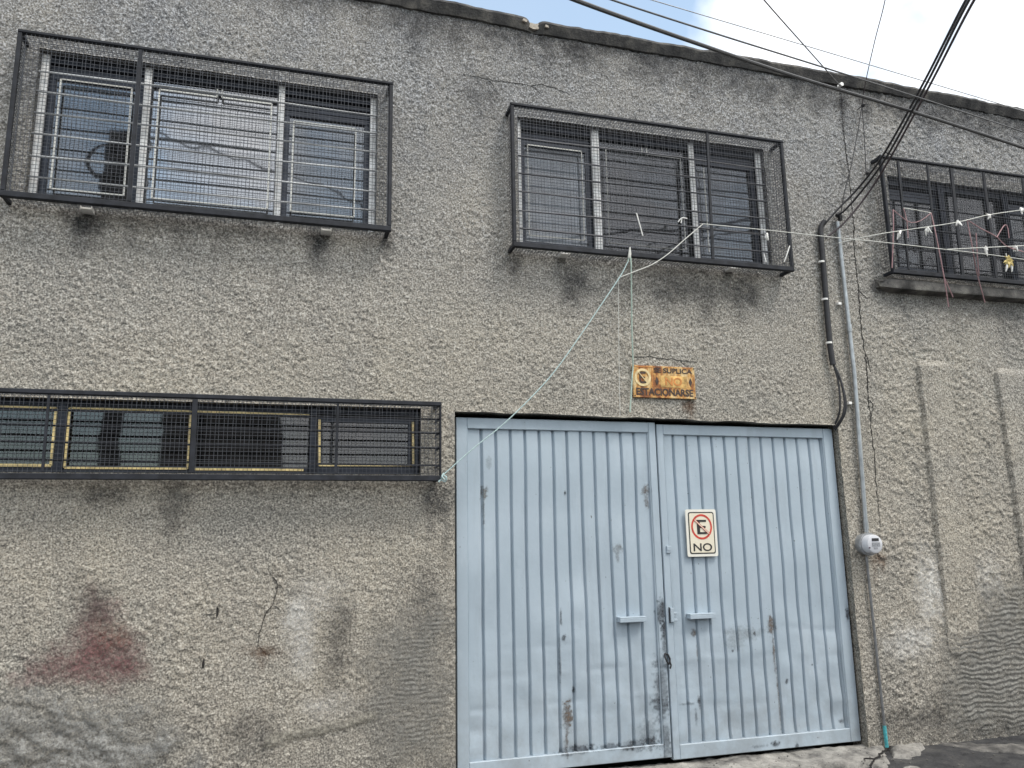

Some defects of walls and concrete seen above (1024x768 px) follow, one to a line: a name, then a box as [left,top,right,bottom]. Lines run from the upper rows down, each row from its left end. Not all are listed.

crack [463,74,570,95]
crack [841,99,881,528]
crack [257,576,283,655]
rust [564,700,573,743]